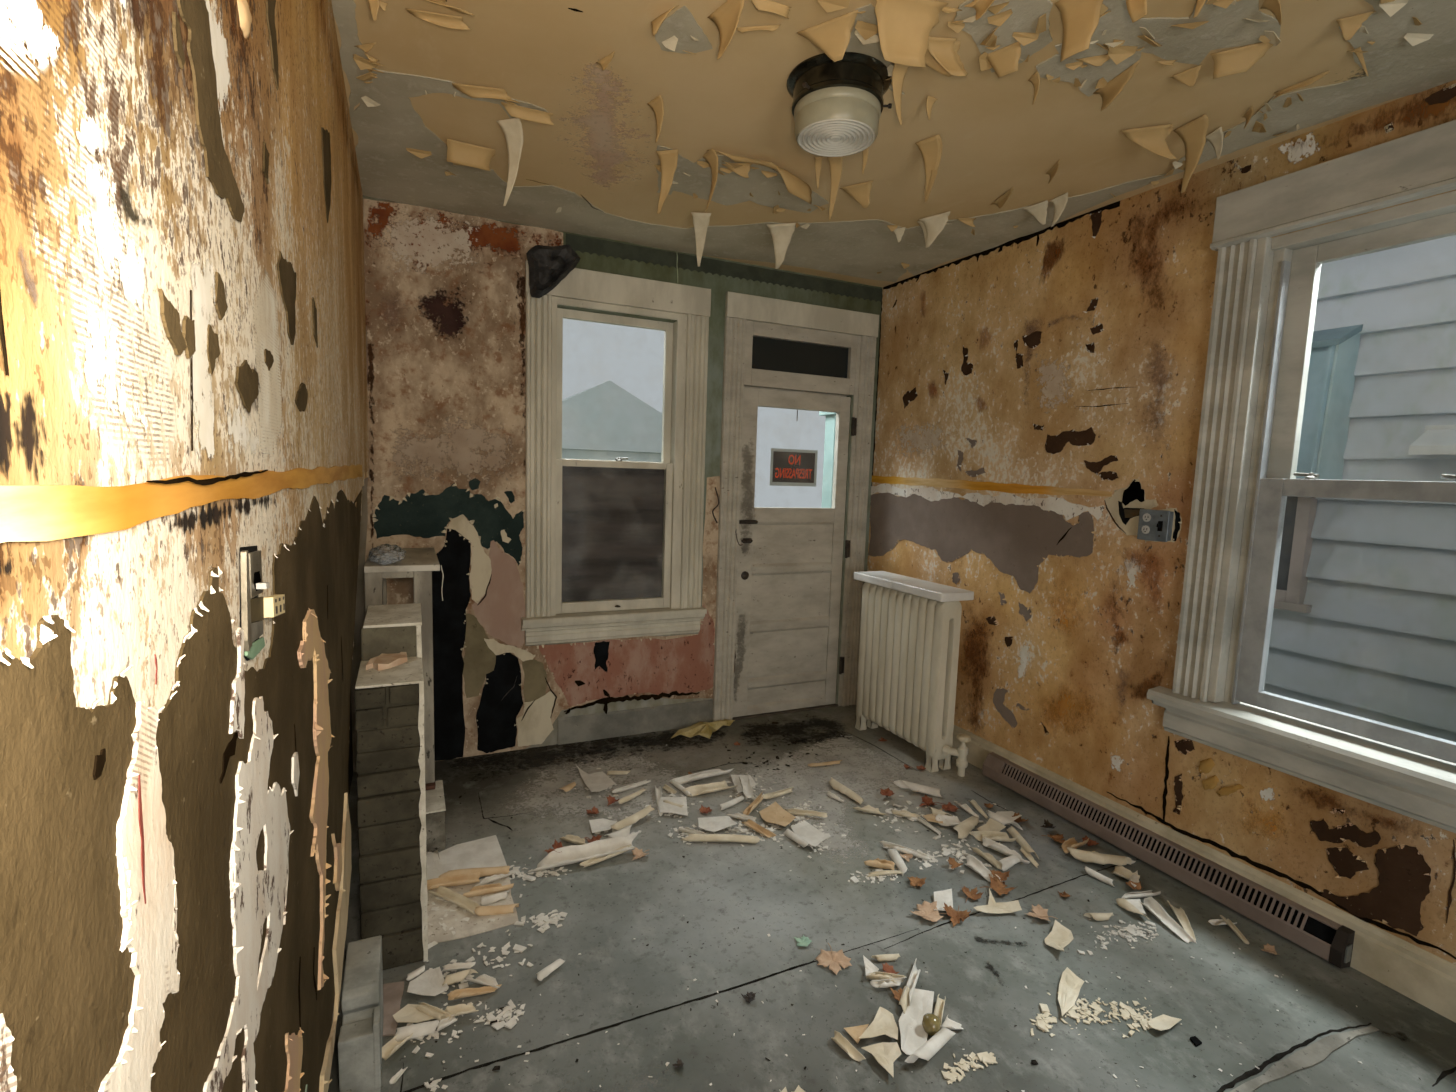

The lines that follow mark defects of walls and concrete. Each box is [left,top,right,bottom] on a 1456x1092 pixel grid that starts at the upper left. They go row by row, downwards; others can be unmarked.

flaking render [158,272,228,375]
flaking render [172,0,244,222]
flaking render [235,349,274,413]
flaking render [277,251,318,348]
water stain [365,300,375,547]
water stain [320,0,562,484]
peeling [406,83,554,206]
peeling [707,0,1282,125]
peeling [868,423,1182,650]
peeling [0,478,715,1092]
crack [1107,736,1456,959]
flaking render [1310,808,1431,936]